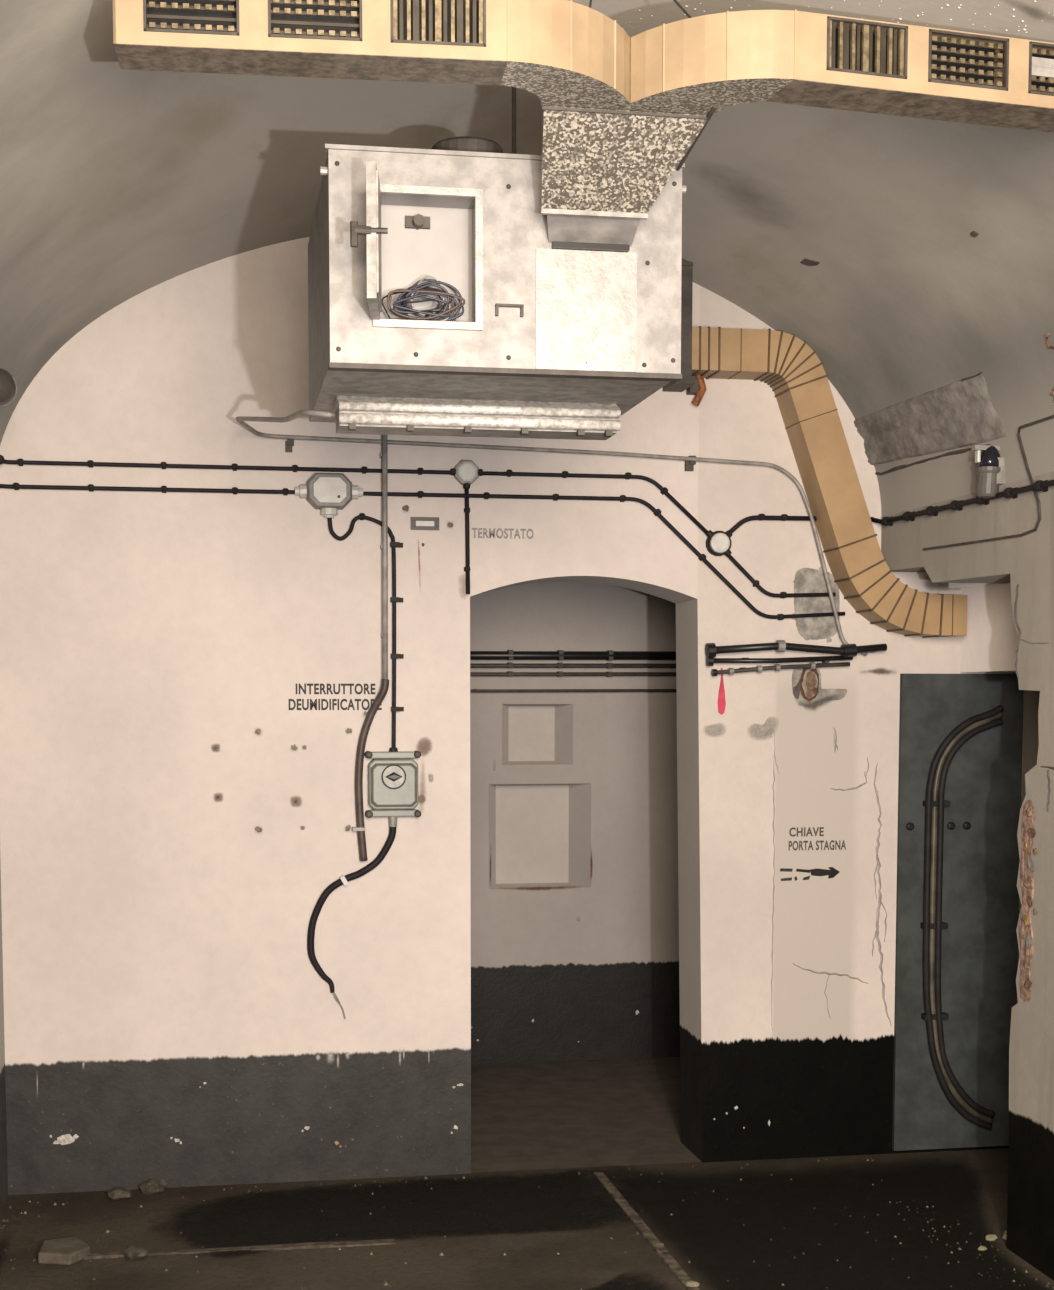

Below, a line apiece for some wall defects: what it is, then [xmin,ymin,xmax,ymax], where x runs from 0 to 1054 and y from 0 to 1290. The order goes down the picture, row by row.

crack [771,728,891,1031]
flaking render [1019,800,1038,1002]
damp [175,1162,1047,1290]